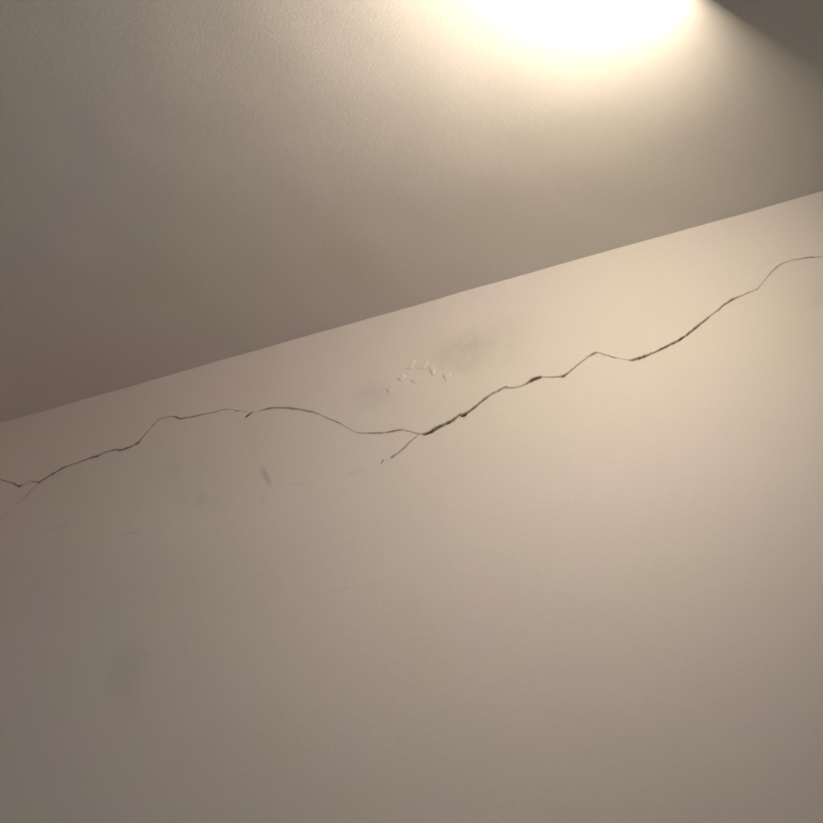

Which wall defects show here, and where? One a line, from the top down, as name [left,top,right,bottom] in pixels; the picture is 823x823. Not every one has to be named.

crack [632,299,734,361]
crack [424,387,507,435]